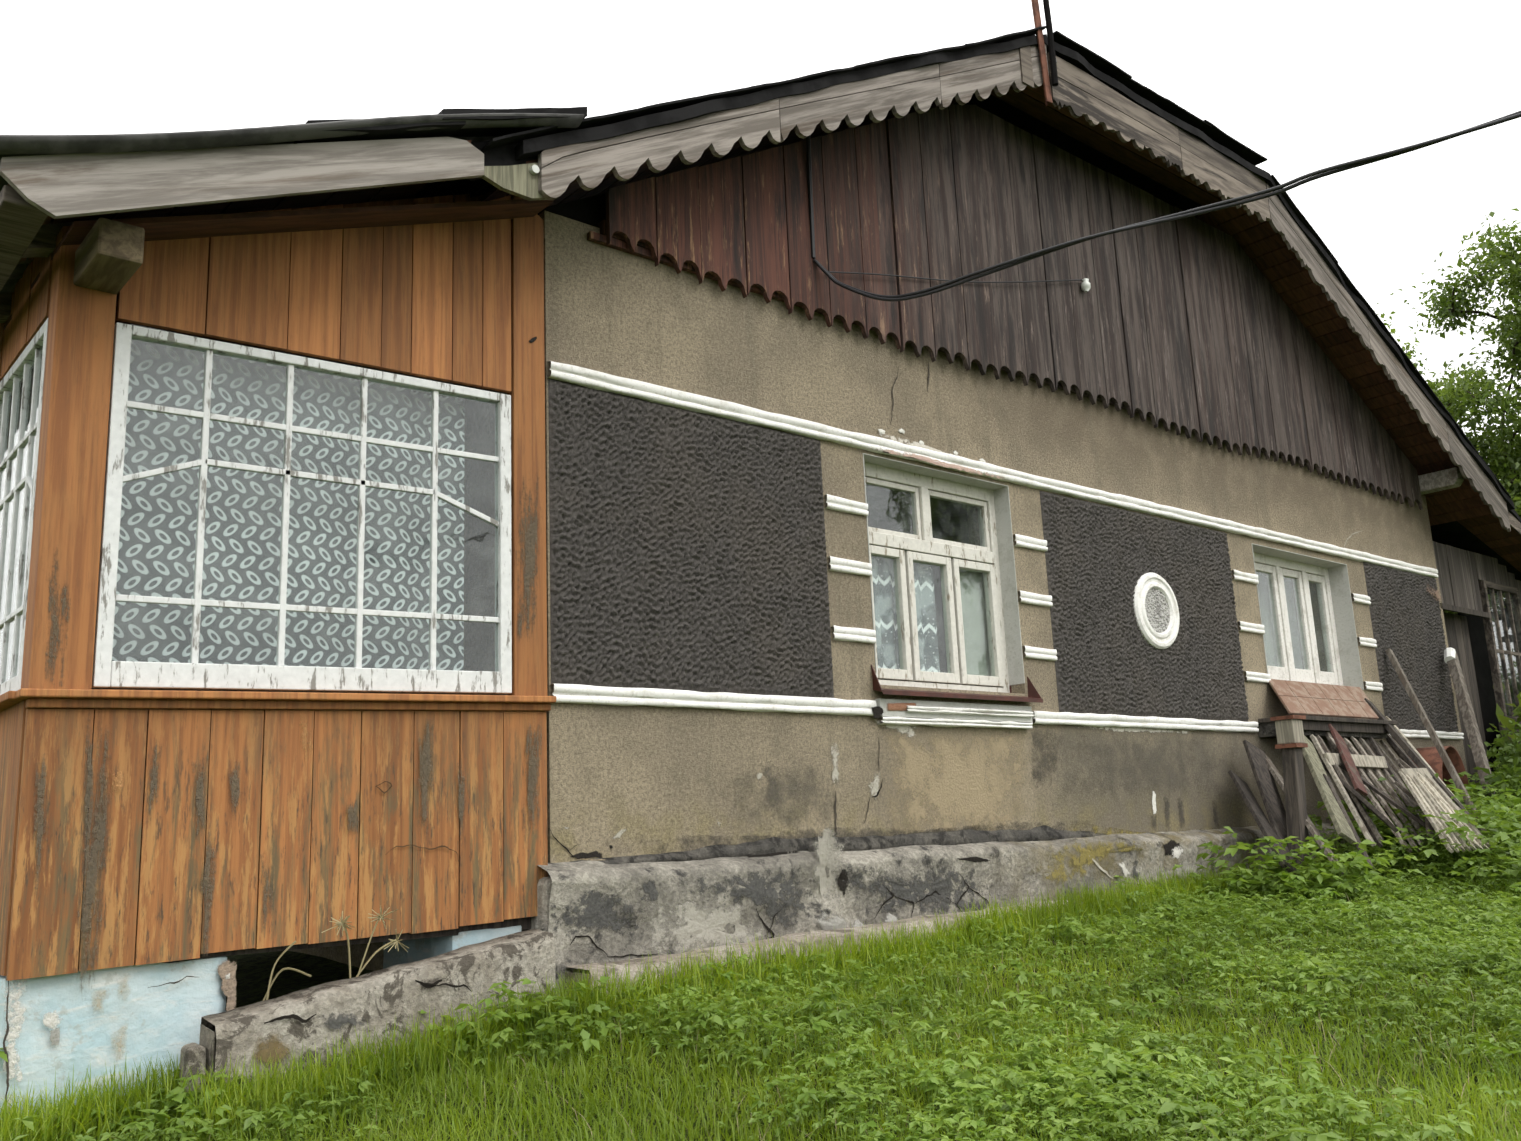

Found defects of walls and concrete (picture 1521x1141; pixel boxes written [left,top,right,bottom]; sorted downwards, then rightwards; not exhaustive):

damp [683,746,1029,851]
crack [874,871,989,919]
crack [415,980,472,992]
peeling [3,979,27,1110]
spalling [43,1010,61,1046]
crack [264,1014,316,1024]